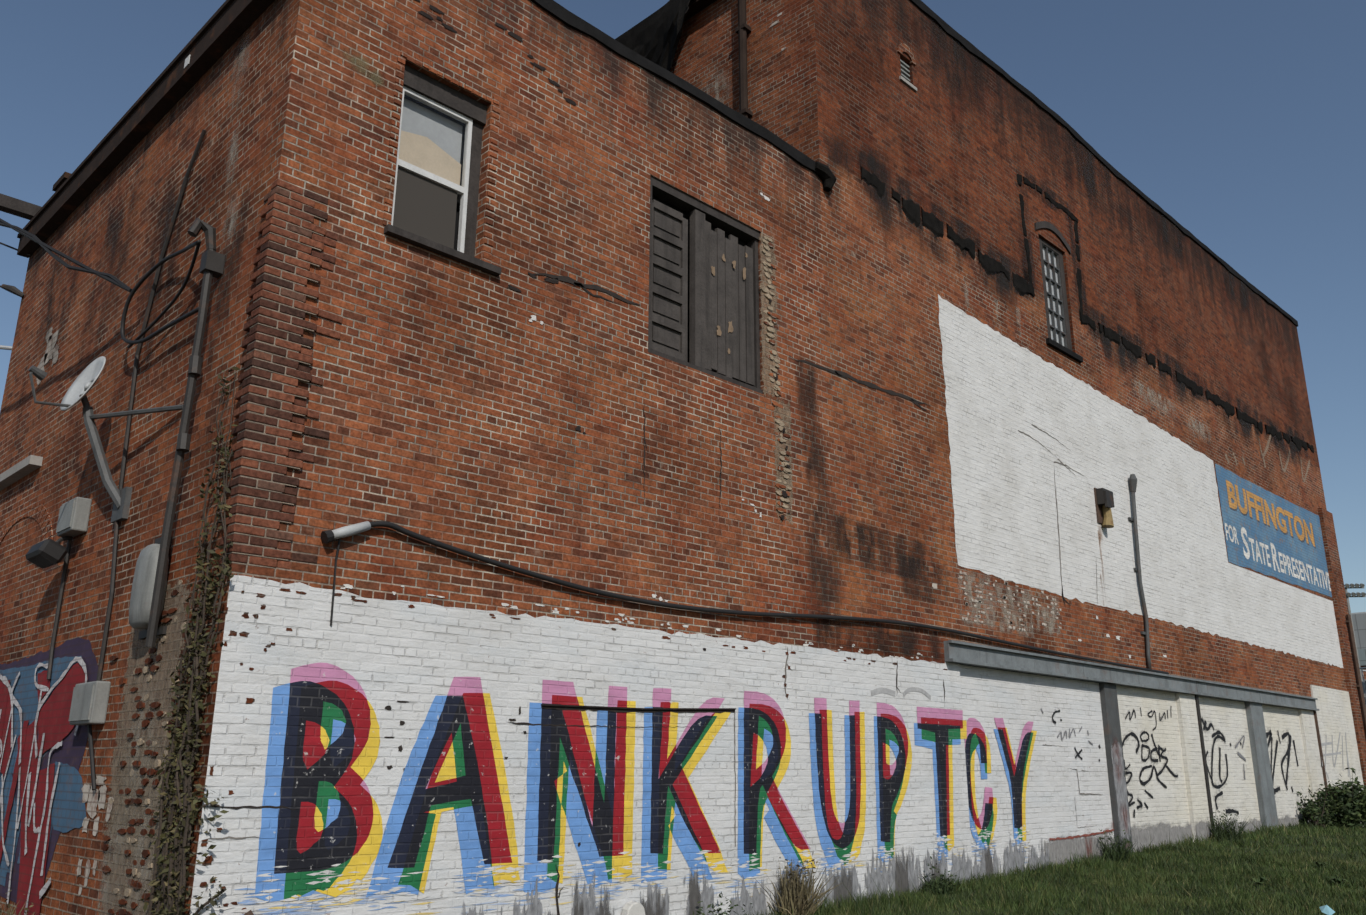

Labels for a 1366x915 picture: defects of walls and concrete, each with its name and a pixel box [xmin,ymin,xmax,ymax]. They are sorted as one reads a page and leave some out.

crack [534,273,640,305]
crack [789,355,931,413]
peeling [224,588,307,646]
peeling [334,584,367,603]
peeling [958,571,1061,632]
peeling [200,828,247,913]